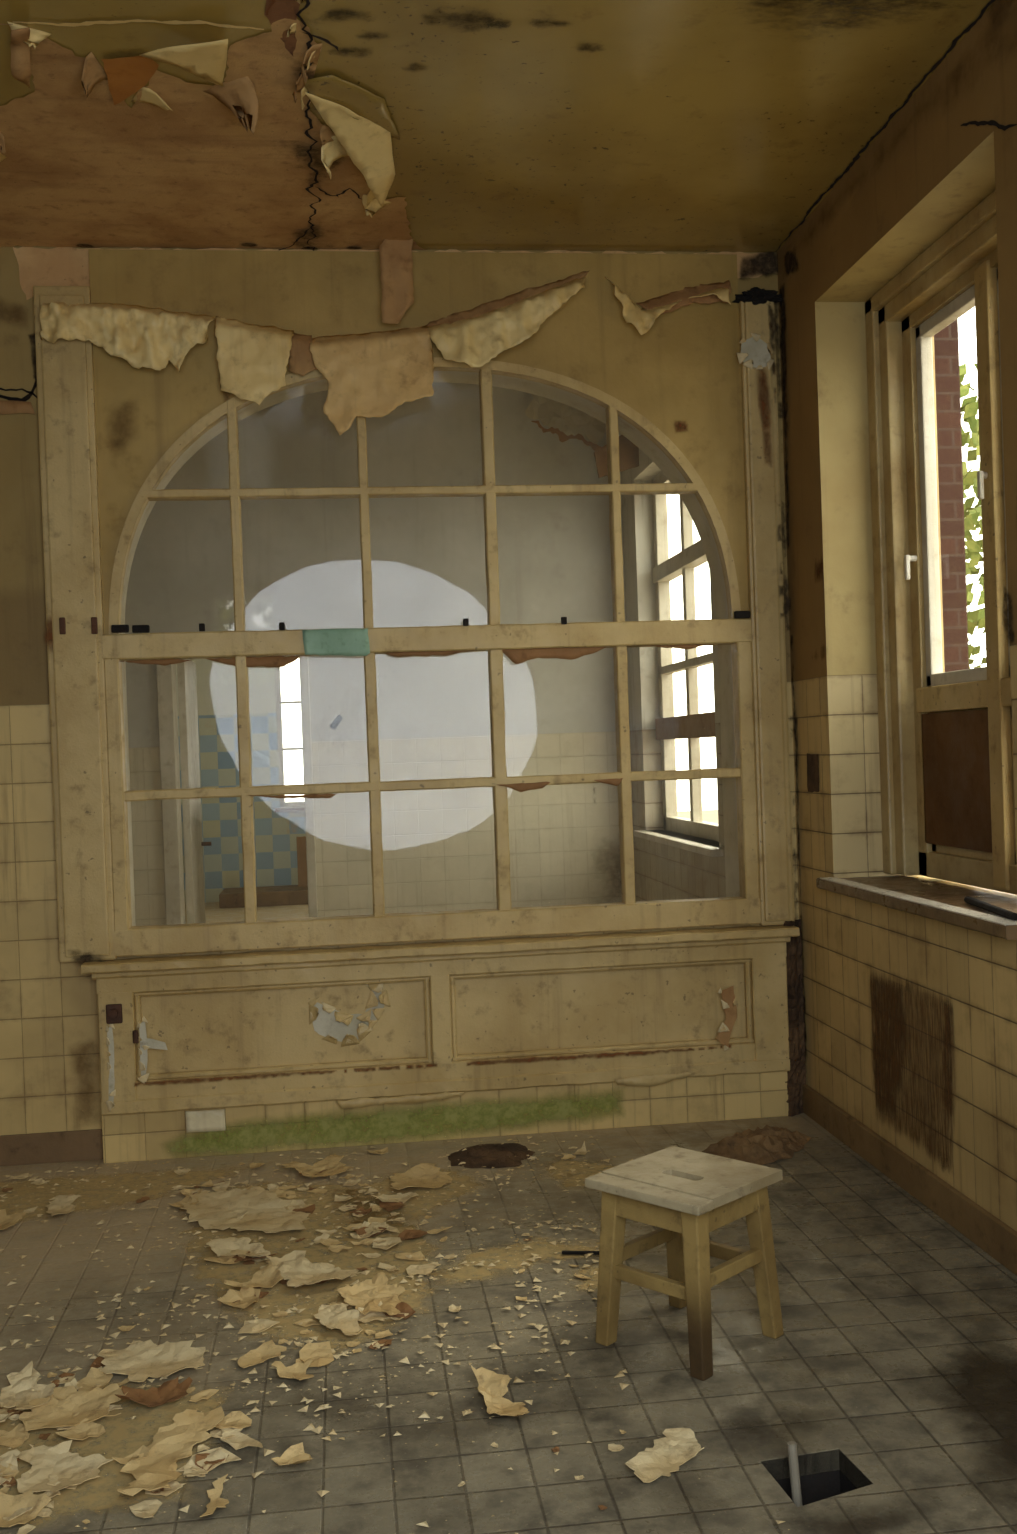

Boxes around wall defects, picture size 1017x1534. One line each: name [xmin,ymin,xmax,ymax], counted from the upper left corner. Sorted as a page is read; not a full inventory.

crack [279,0,361,251]
peeling [0,18,666,324]
peeling [308,983,391,1047]